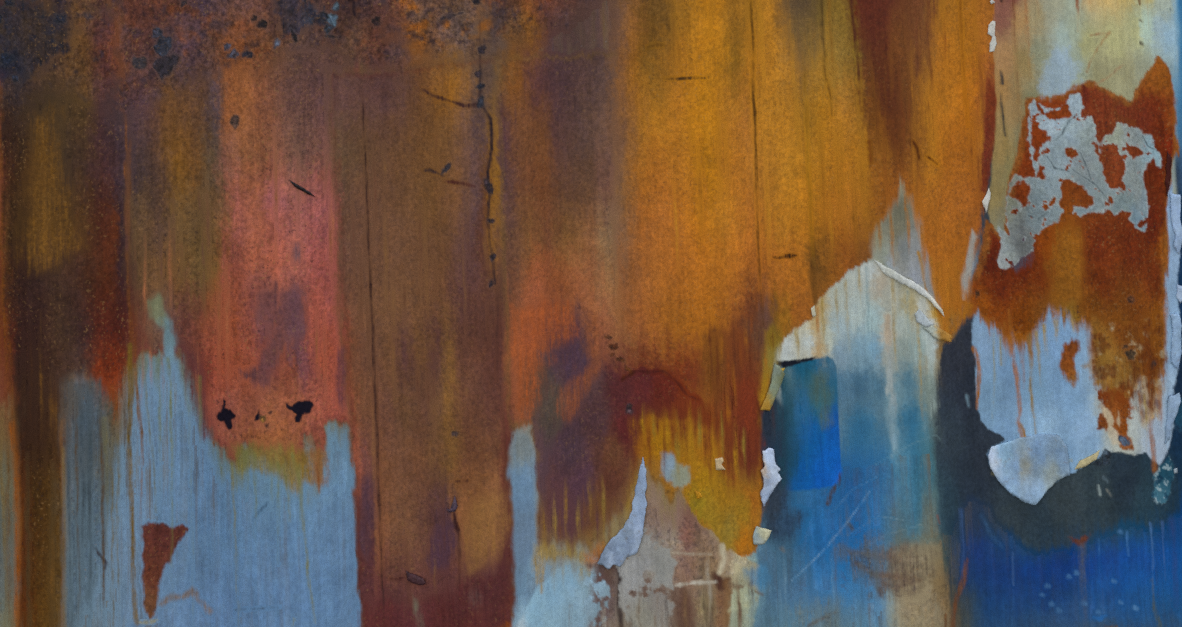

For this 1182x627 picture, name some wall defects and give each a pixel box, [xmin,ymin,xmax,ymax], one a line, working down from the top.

peeling [988,21,997,52]
peeling [982,189,991,212]
peeling [1165,151,1182,254]
corrosion [0,0,522,627]
corrosion [469,0,1182,597]
peeling [776,260,942,469]
peeling [1170,284,1182,370]
peeling [1165,393,1182,444]
peeling [566,503,762,627]
peeling [753,526,771,545]
corrosion [1038,531,1141,627]